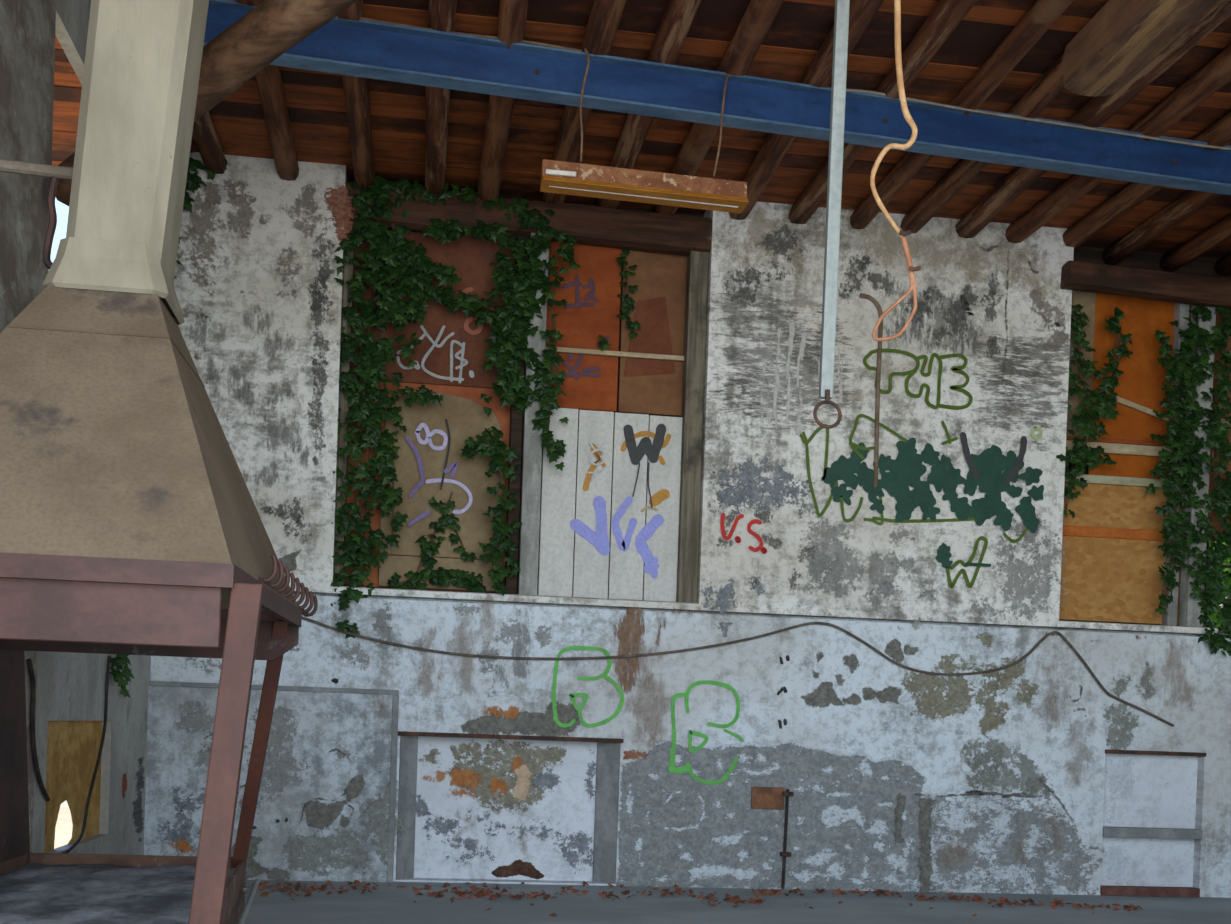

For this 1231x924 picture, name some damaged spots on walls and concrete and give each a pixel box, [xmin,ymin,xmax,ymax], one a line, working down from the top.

flaking render [511,764,534,800]
spalling [491,860,545,879]